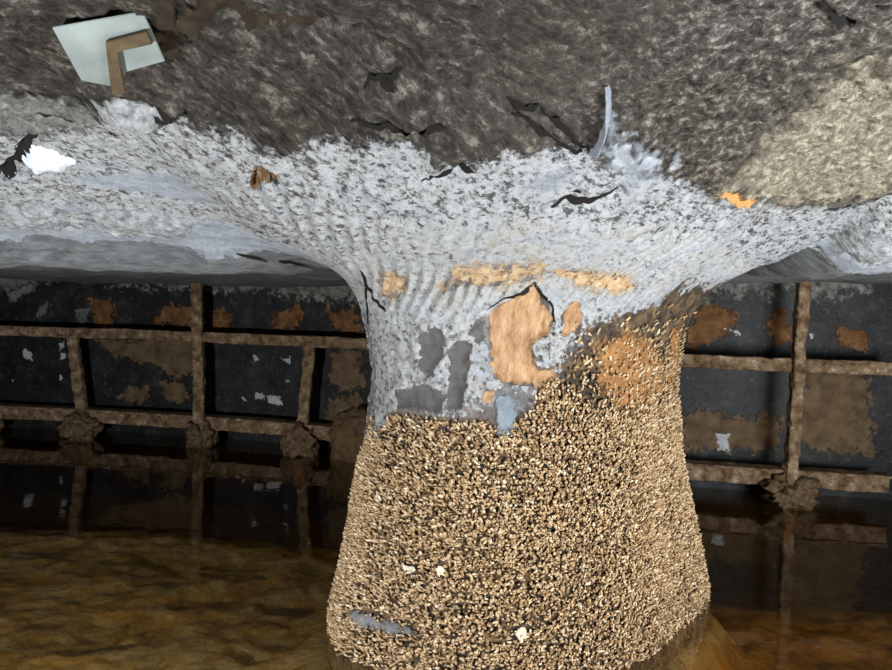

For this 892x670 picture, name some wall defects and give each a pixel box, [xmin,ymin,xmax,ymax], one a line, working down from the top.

corrosion [203,307,233,332]
corrosion [271,299,305,333]
corrosion [324,302,365,335]
spalling [394,285,583,414]
corrosion [763,308,793,348]
corrosion [832,326,870,354]
corrosion [324,348,369,424]
peeling [481,390,517,438]
corrosion [680,408,785,456]
corrosion [801,372,879,458]